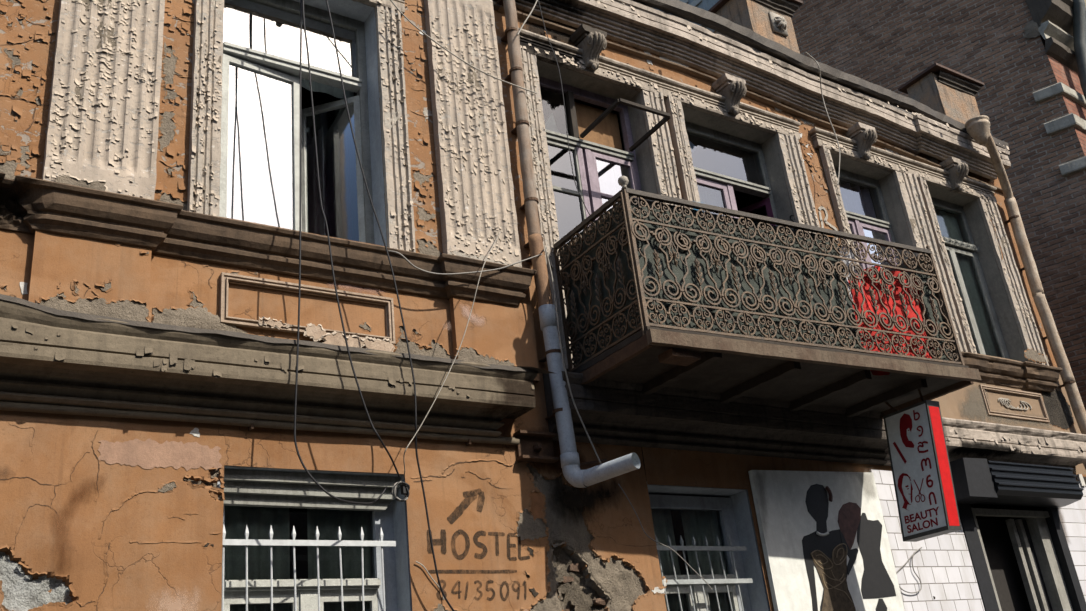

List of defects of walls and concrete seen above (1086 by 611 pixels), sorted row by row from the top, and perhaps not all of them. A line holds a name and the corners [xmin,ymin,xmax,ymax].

peeling [377,0,520,267]
peeling [520,43,589,279]
peeling [603,51,726,198]
peeling [740,92,858,260]
peeling [0,277,152,322]
peeling [136,345,195,371]
spalling [0,545,78,611]
crack [0,425,221,611]
spalling [514,462,667,611]